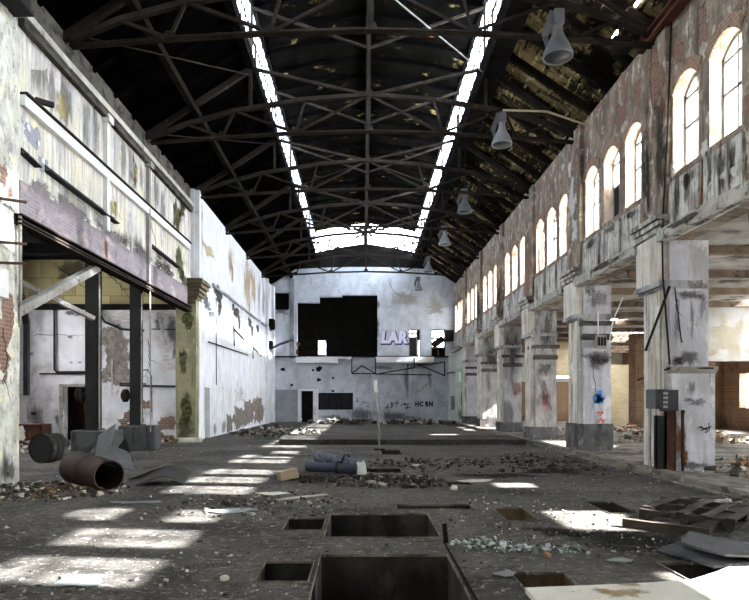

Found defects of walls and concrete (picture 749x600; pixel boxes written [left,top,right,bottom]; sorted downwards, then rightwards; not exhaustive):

spalling [0,156,14,210]
leakage [674,171,694,217]
leakage [707,141,735,189]
spalling [0,293,15,384]
spalling [102,320,130,391]
spalling [118,405,130,425]
spalling [143,400,176,430]
spalling [226,391,265,433]